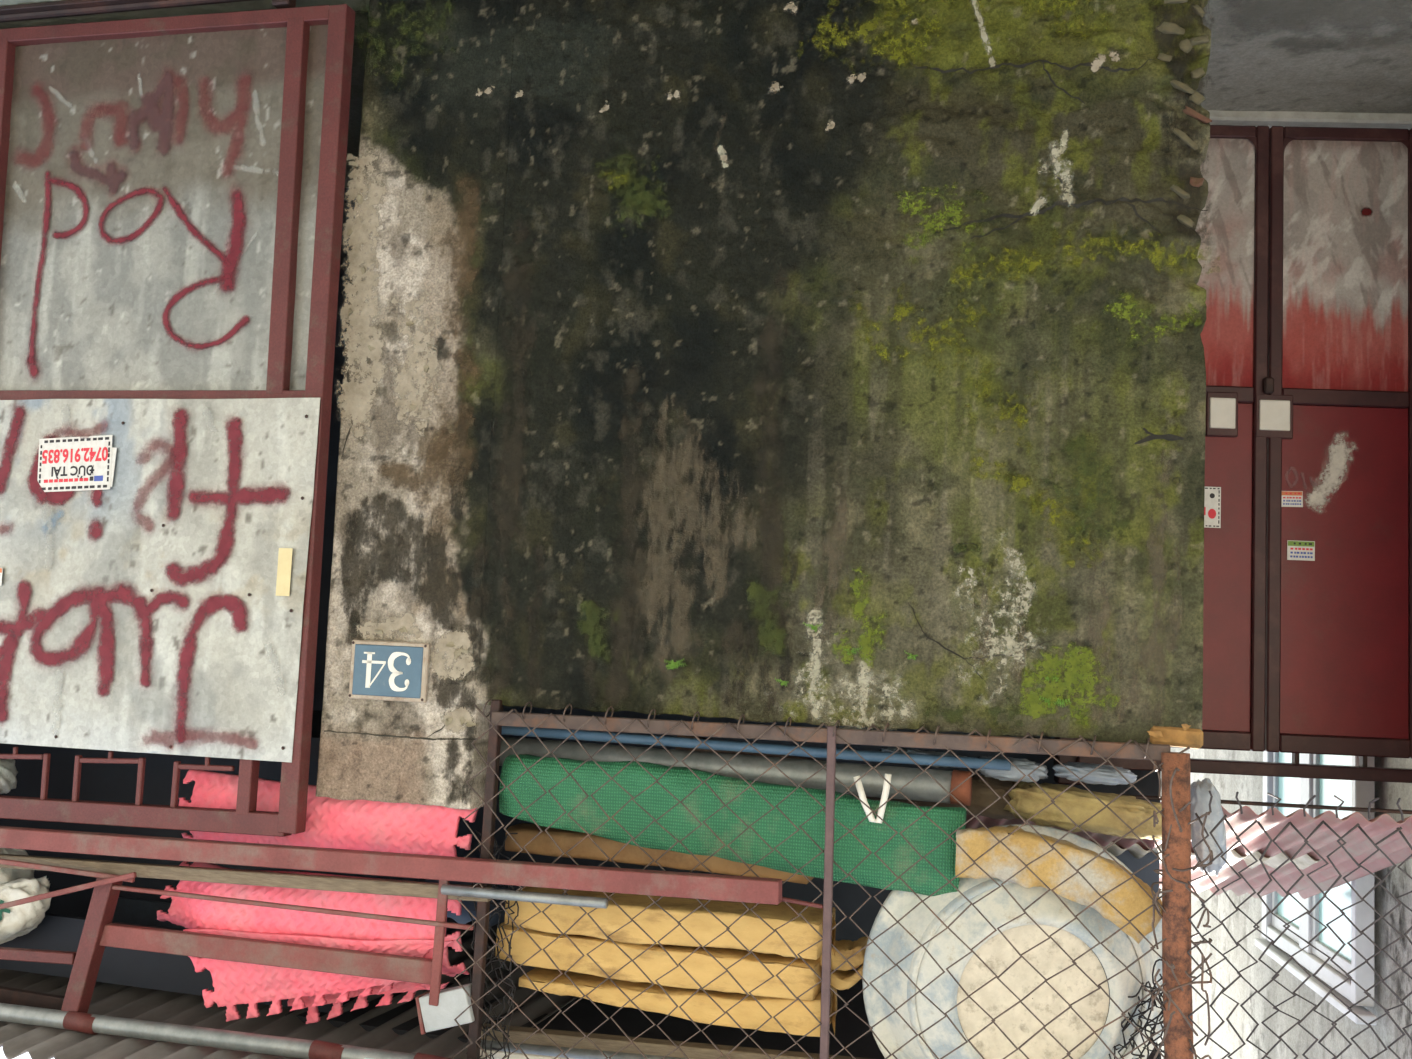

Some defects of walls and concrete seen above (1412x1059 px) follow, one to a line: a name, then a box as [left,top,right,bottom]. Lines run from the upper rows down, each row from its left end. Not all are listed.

damp [972,0,995,67]
damp [1030,129,1073,214]
damp [340,181,544,803]
damp [584,266,911,729]
damp [955,549,1035,694]